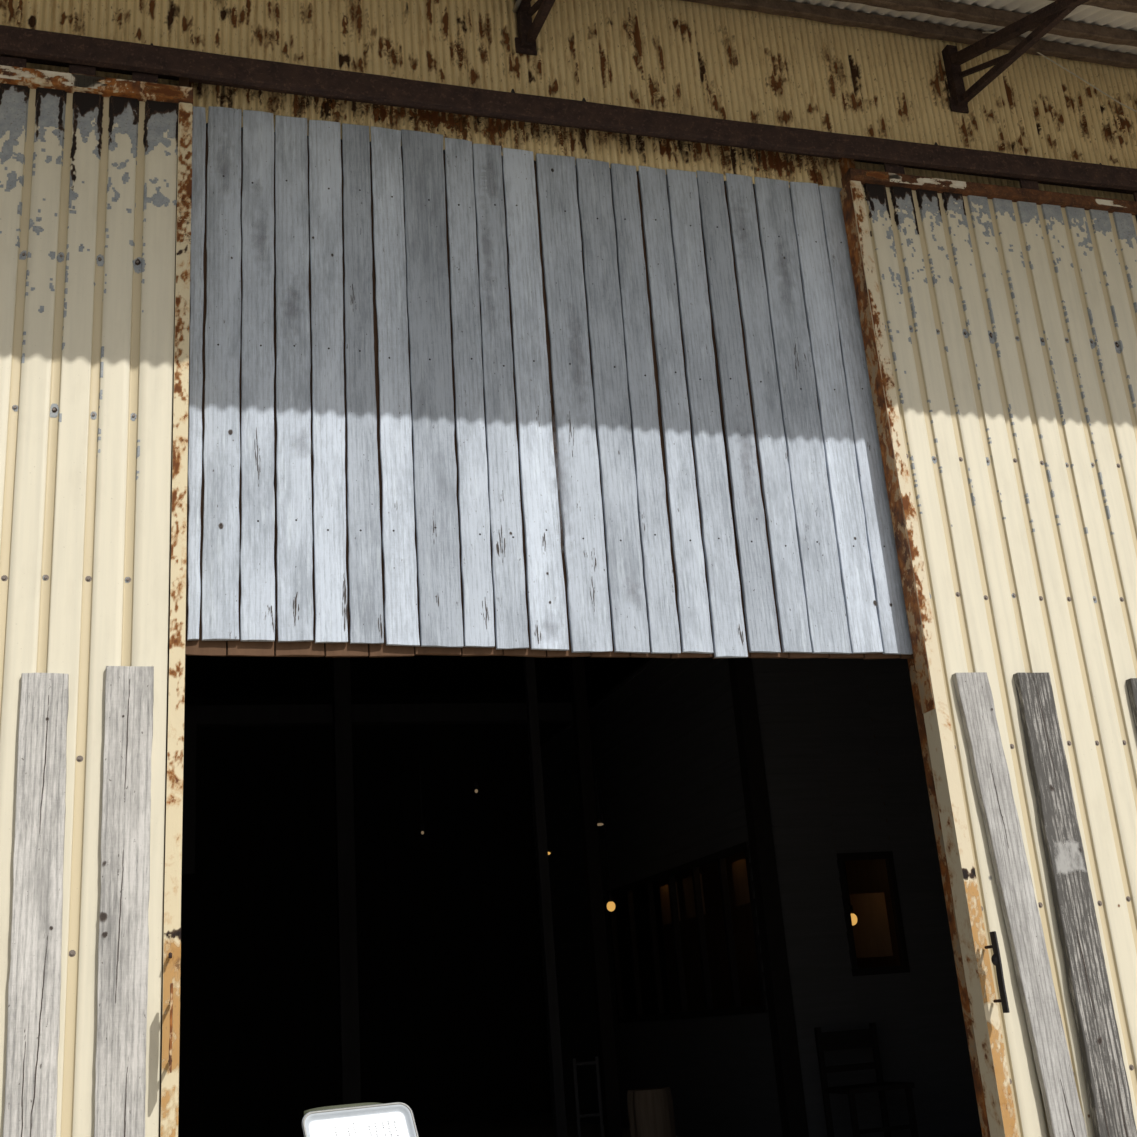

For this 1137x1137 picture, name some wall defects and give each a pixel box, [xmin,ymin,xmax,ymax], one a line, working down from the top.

corrosion [113,0,303,60]
peeling [48,223,109,350]
peeling [0,65,178,296]
corrosion [0,75,839,255]
corrosion [851,172,966,271]
peeling [866,173,1137,382]
corrosion [959,77,1137,164]
peeling [91,346,104,453]
peeling [1061,300,1095,444]
corrosion [171,424,186,563]
peeling [1091,459,1114,535]
corrosion [162,928,181,1073]